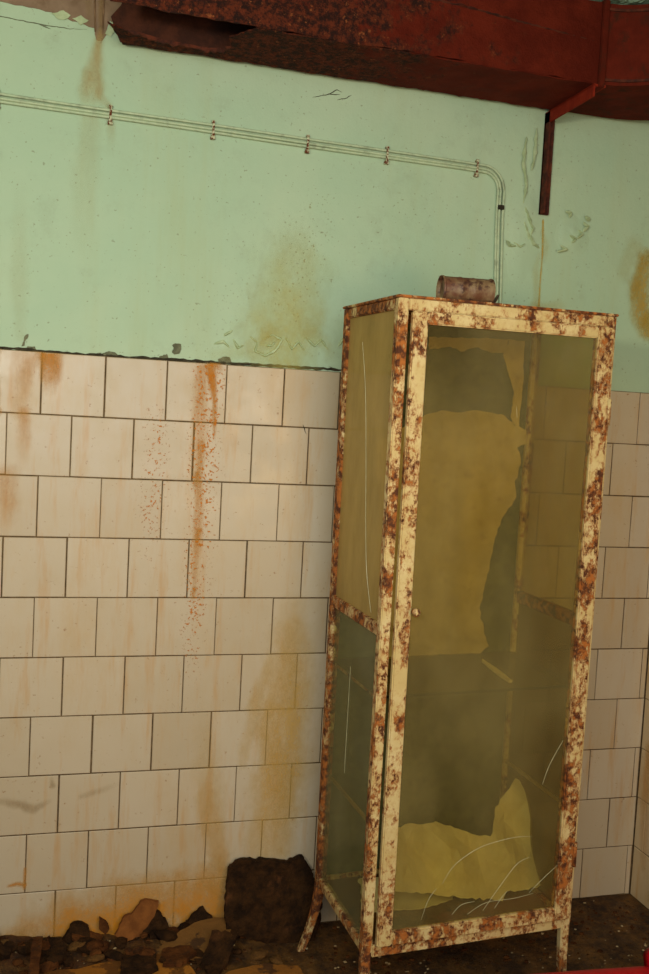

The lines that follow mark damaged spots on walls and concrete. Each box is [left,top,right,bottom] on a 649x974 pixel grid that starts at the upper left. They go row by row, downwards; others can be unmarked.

peeling [0,0,122,41]
leakage [632,255,649,337]
corrosion [183,363,224,664]